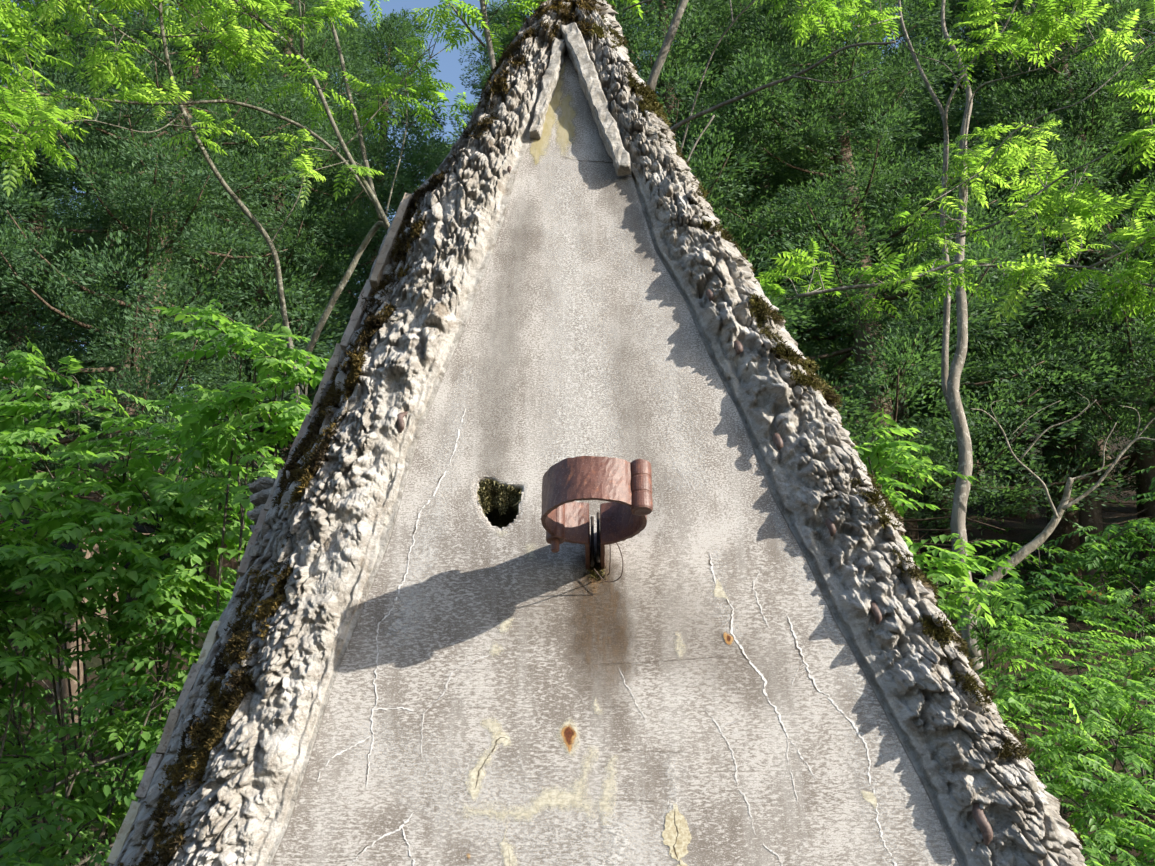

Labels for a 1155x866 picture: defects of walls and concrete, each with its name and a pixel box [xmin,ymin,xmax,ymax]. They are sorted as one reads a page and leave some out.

water stain [530,61,615,463]
spalling [469,470,529,536]
crack [317,408,493,787]
water stain [573,552,629,679]
peeling [469,719,511,799]
rust [560,720,578,755]
crack [706,553,897,866]
peeling [662,803,692,866]